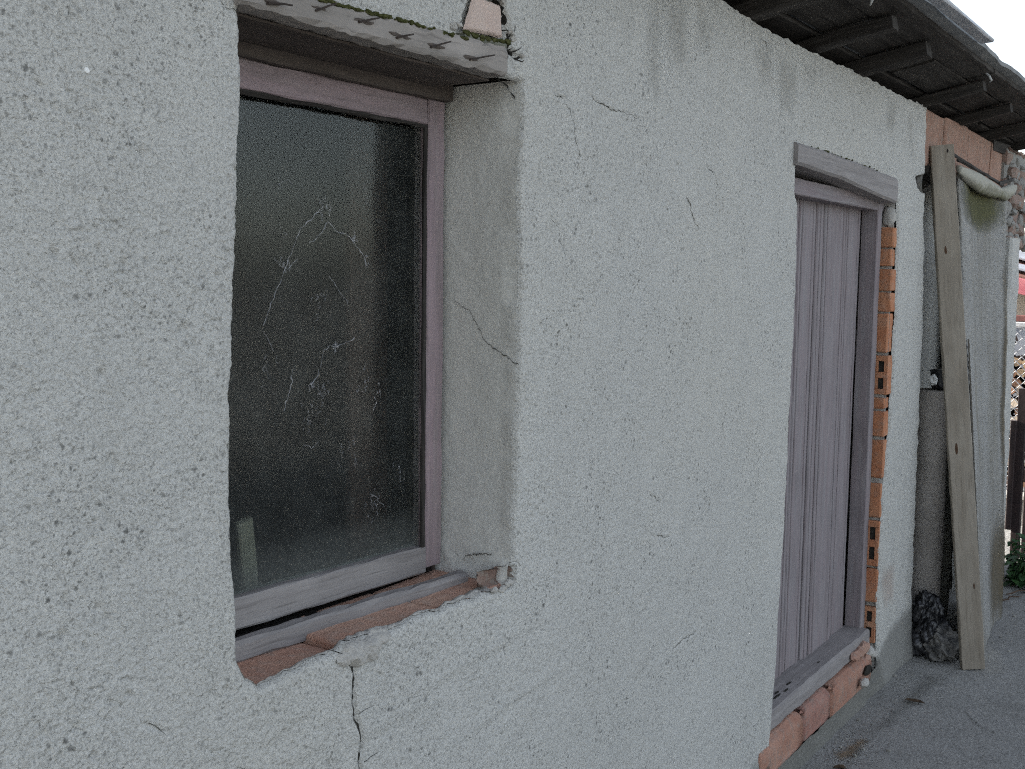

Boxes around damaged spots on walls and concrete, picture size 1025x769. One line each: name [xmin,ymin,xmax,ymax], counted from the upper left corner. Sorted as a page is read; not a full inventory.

spalling [450,0,517,48]
crack [455,300,519,365]
spalling [476,566,514,594]
crack [330,649,379,769]